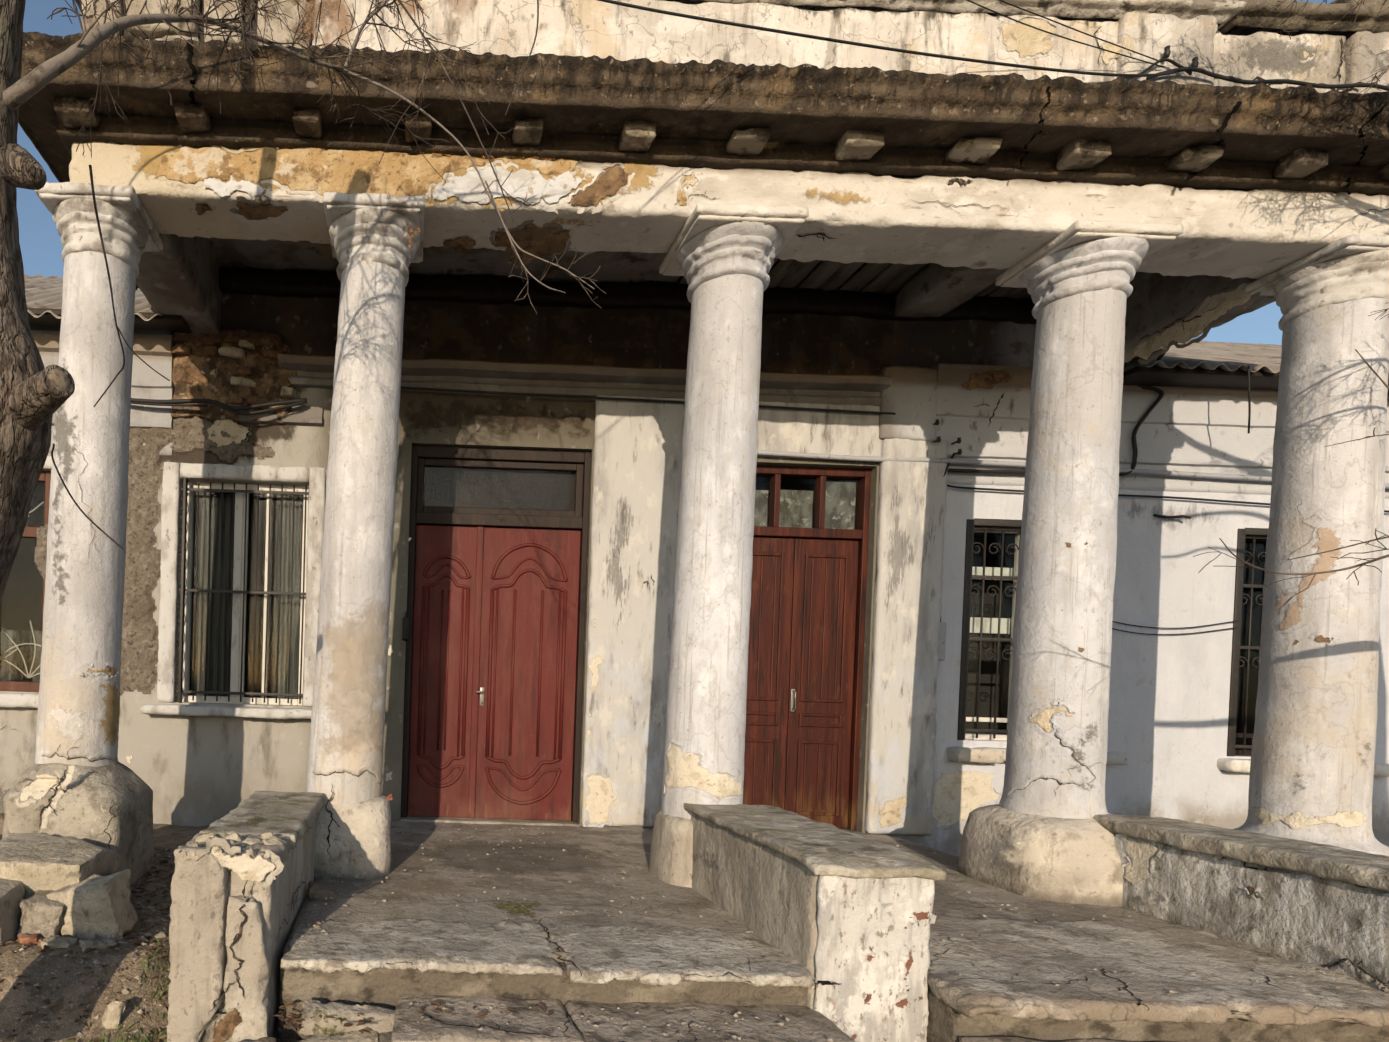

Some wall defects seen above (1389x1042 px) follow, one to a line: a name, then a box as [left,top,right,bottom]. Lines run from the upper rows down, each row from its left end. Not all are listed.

flaking render [1002,15,1057,63]
crack [1020,86,1051,168]
crack [1184,39,1389,218]
flaking render [155,145,635,220]
flaking render [443,220,572,269]
flaking render [171,329,297,447]
peeling [1276,528,1342,648]
flaking render [15,770,63,808]
flaking render [663,738,742,803]
crack [1006,728,1105,796]
crack [275,765,384,942]
crack [209,880,250,1012]